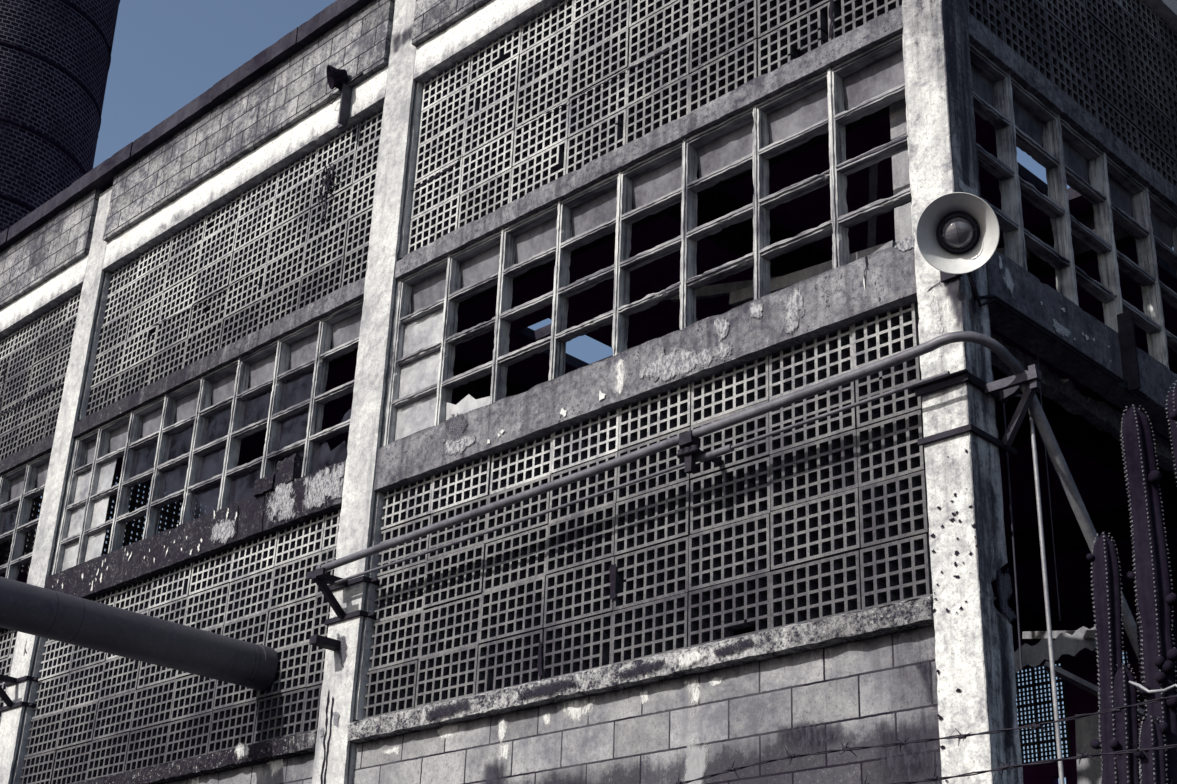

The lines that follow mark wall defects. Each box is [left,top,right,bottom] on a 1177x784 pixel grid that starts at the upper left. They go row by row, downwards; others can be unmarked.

peeling [253,453,345,523]
peeling [125,509,237,560]
water stain [425,699,471,739]
water stain [485,719,509,784]
water stain [519,679,593,724]
efflorescence [684,745,708,784]
water stain [778,723,842,749]